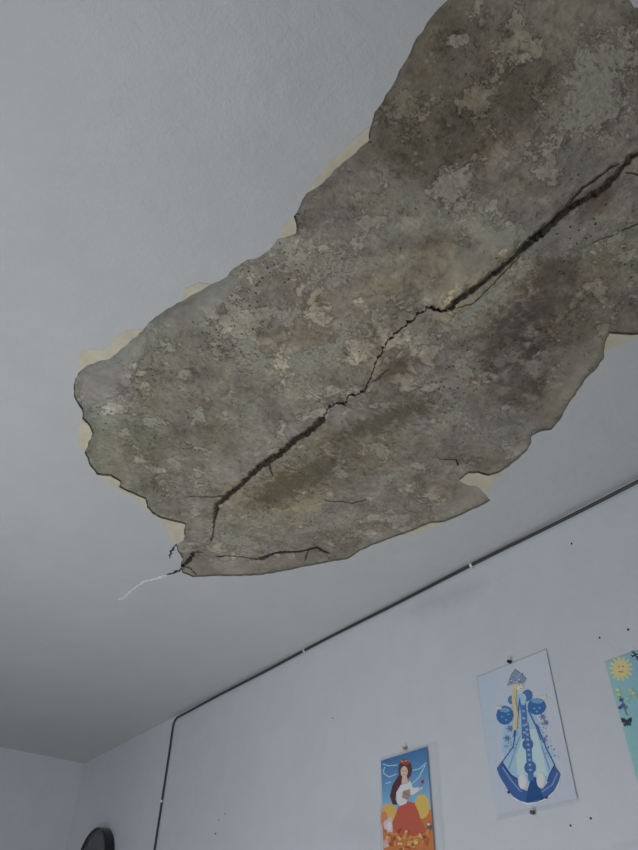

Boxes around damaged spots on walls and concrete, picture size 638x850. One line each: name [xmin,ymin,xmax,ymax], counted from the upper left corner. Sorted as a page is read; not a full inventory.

flaking render [74,0,638,577]
crack [118,152,638,600]